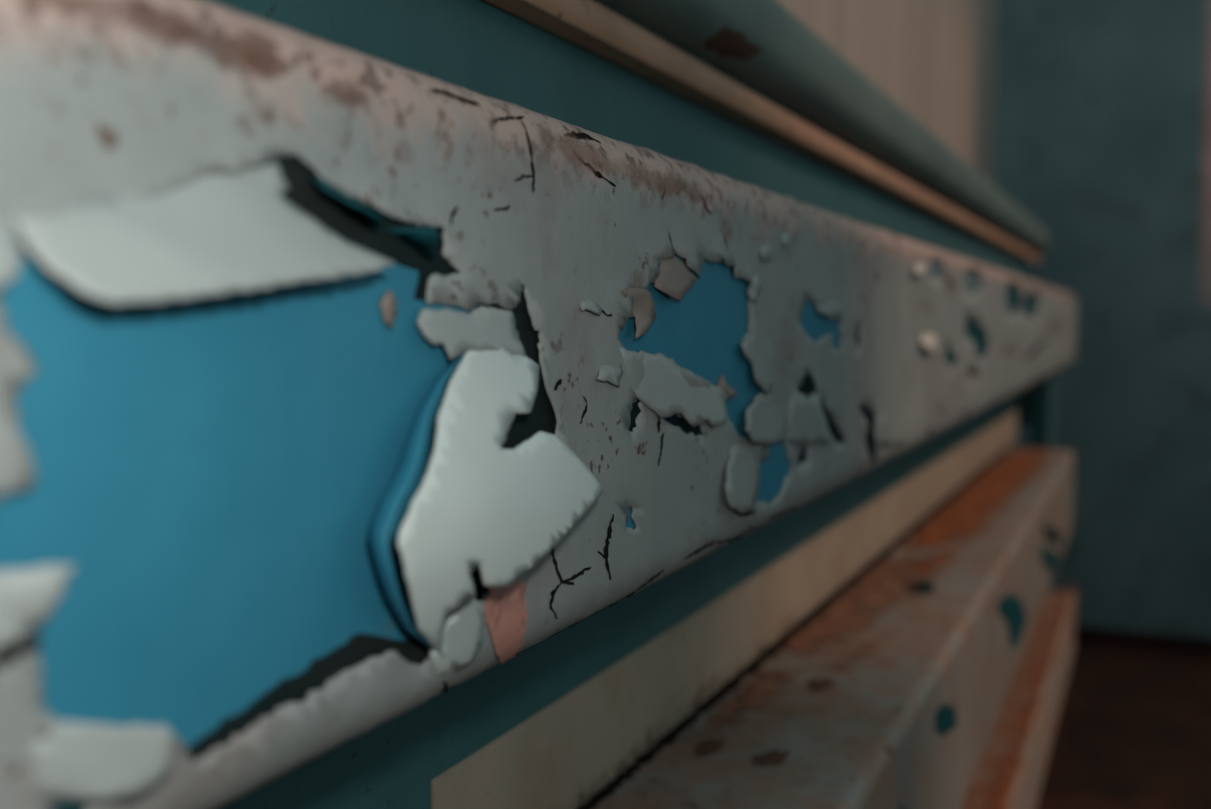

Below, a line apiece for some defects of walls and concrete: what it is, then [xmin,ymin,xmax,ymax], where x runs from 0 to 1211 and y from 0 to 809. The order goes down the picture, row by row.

crack [429,88,535,211]
crack [564,131,616,187]
peeling [799,299,859,349]
peeling [921,333,957,370]
peeling [965,318,988,381]
peeling [1006,281,1039,319]
crack [554,379,588,424]
peeling [596,255,844,514]
crack [656,416,664,466]
peeling [859,404,898,467]
peeling [0,162,604,809]